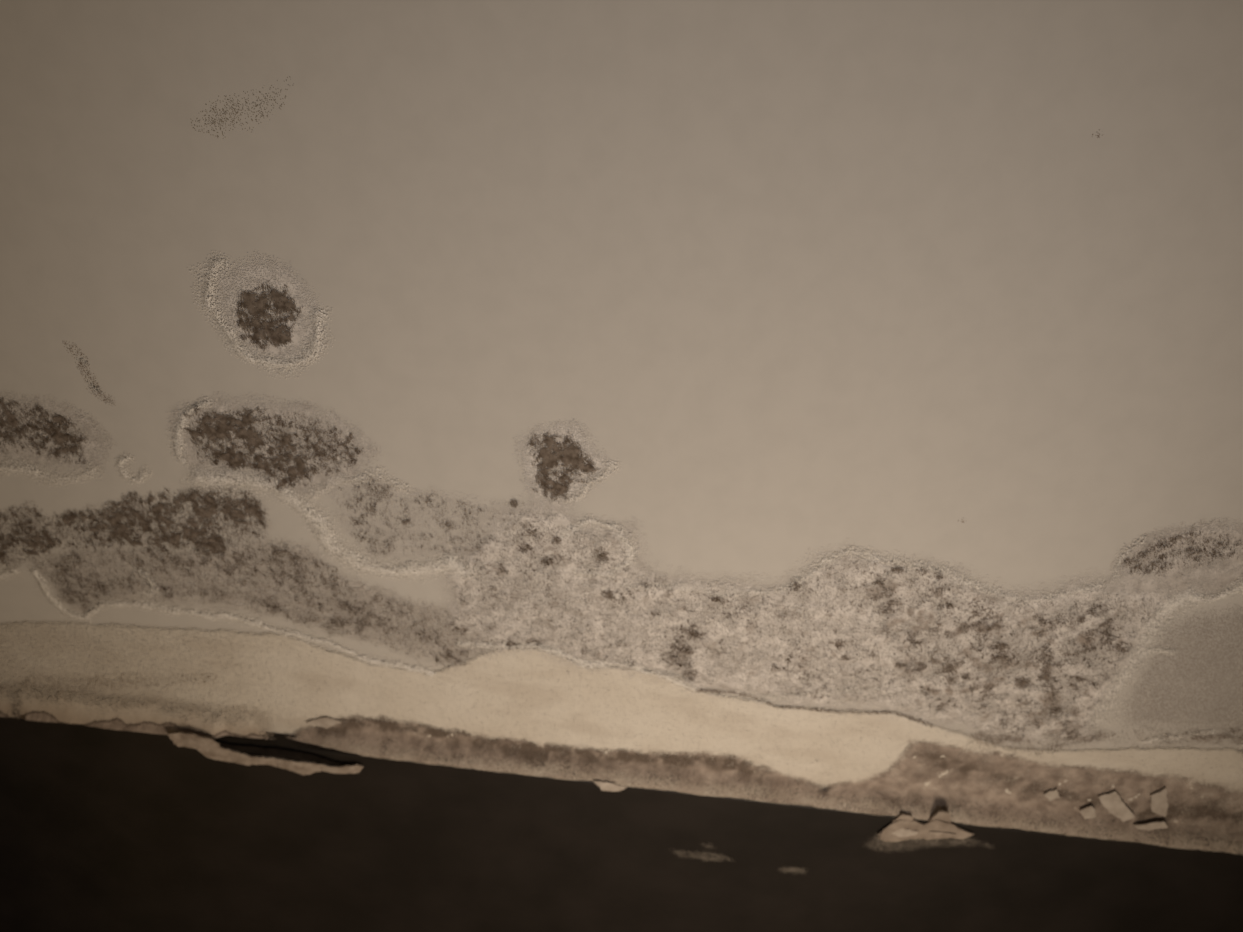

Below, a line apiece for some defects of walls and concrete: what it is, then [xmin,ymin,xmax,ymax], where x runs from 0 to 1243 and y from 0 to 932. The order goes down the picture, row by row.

damp [187,251,333,380]
damp [0,390,1243,752]
peeling [0,680,1243,854]